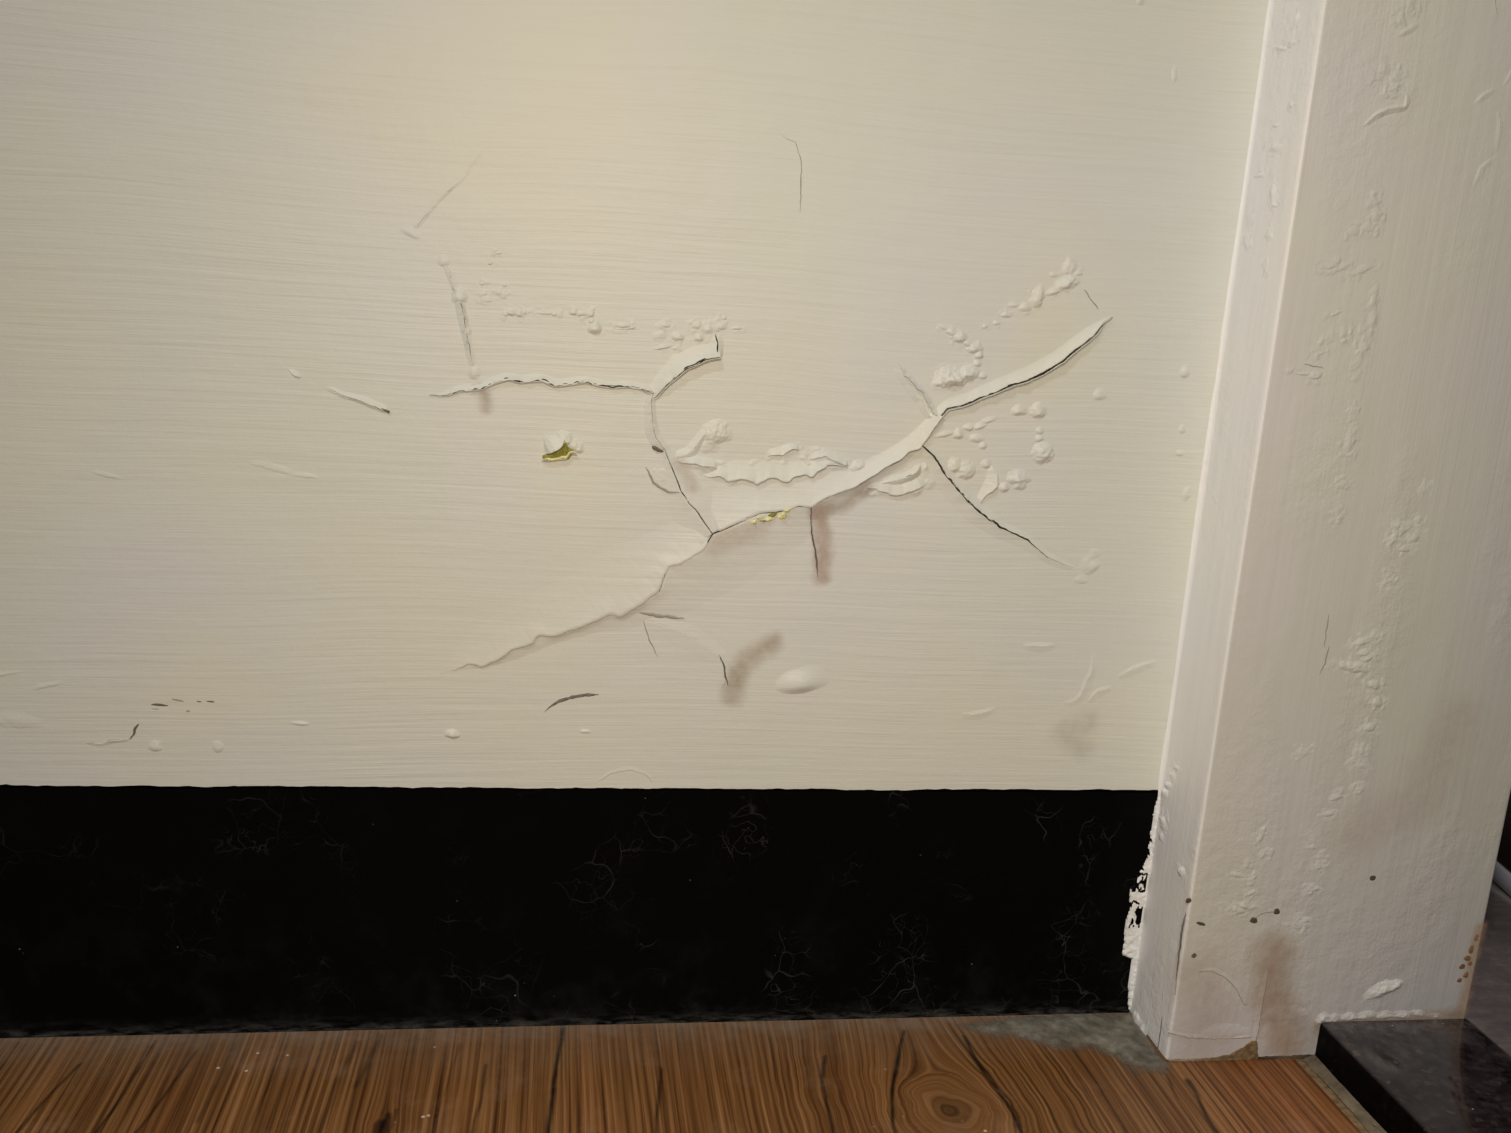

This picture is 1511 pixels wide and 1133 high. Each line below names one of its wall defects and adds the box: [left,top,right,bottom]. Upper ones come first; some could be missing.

crack [782,135,802,208]
crack [399,146,1113,675]
peeling [747,509,792,524]
peeling [1122,798,1160,1007]